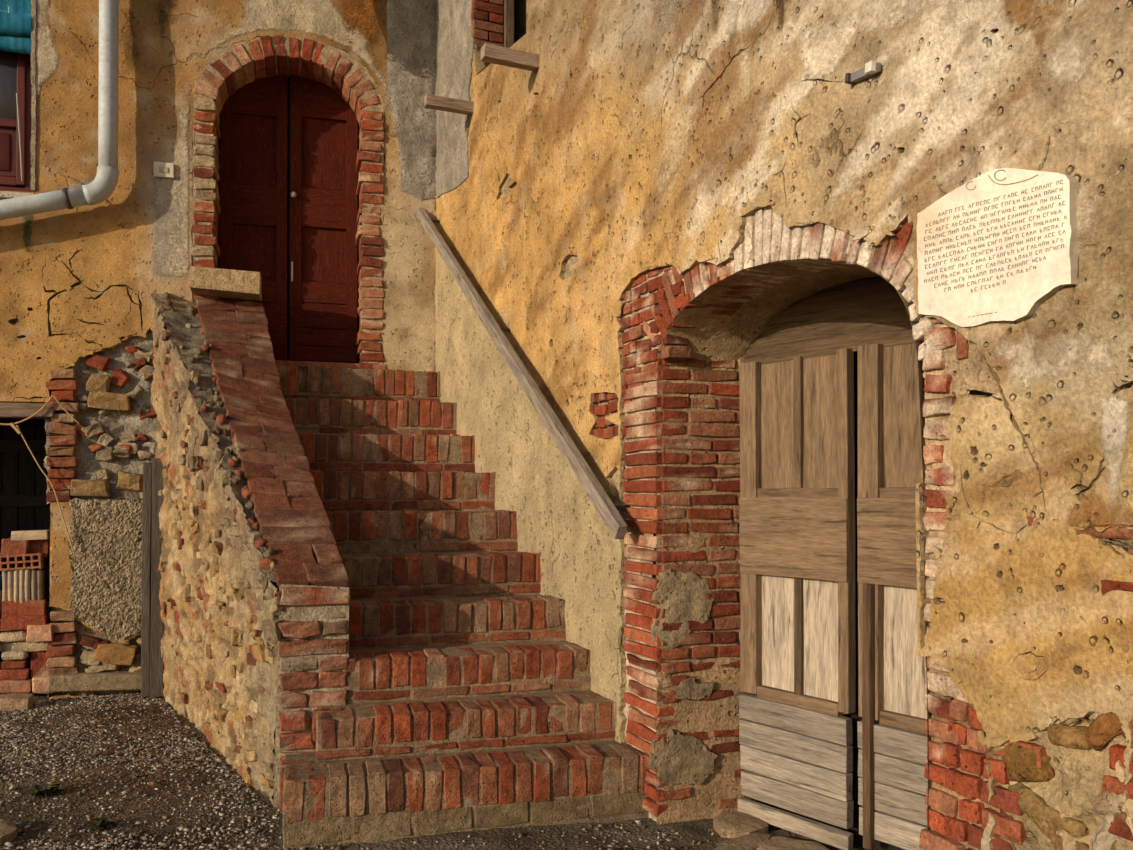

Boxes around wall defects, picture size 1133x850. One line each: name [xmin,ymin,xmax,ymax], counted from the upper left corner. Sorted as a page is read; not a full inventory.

water stain [1005,0,1063,50]
crack [44,250,143,346]
flaking render [846,228,916,302]
flaking render [919,315,1000,399]
flaking render [43,330,159,504]
crack [984,350,1044,492]
flaking render [590,201,775,755]
flaking render [921,439,970,512]
flaking render [1078,524,1133,595]
flaking render [919,669,1133,850]